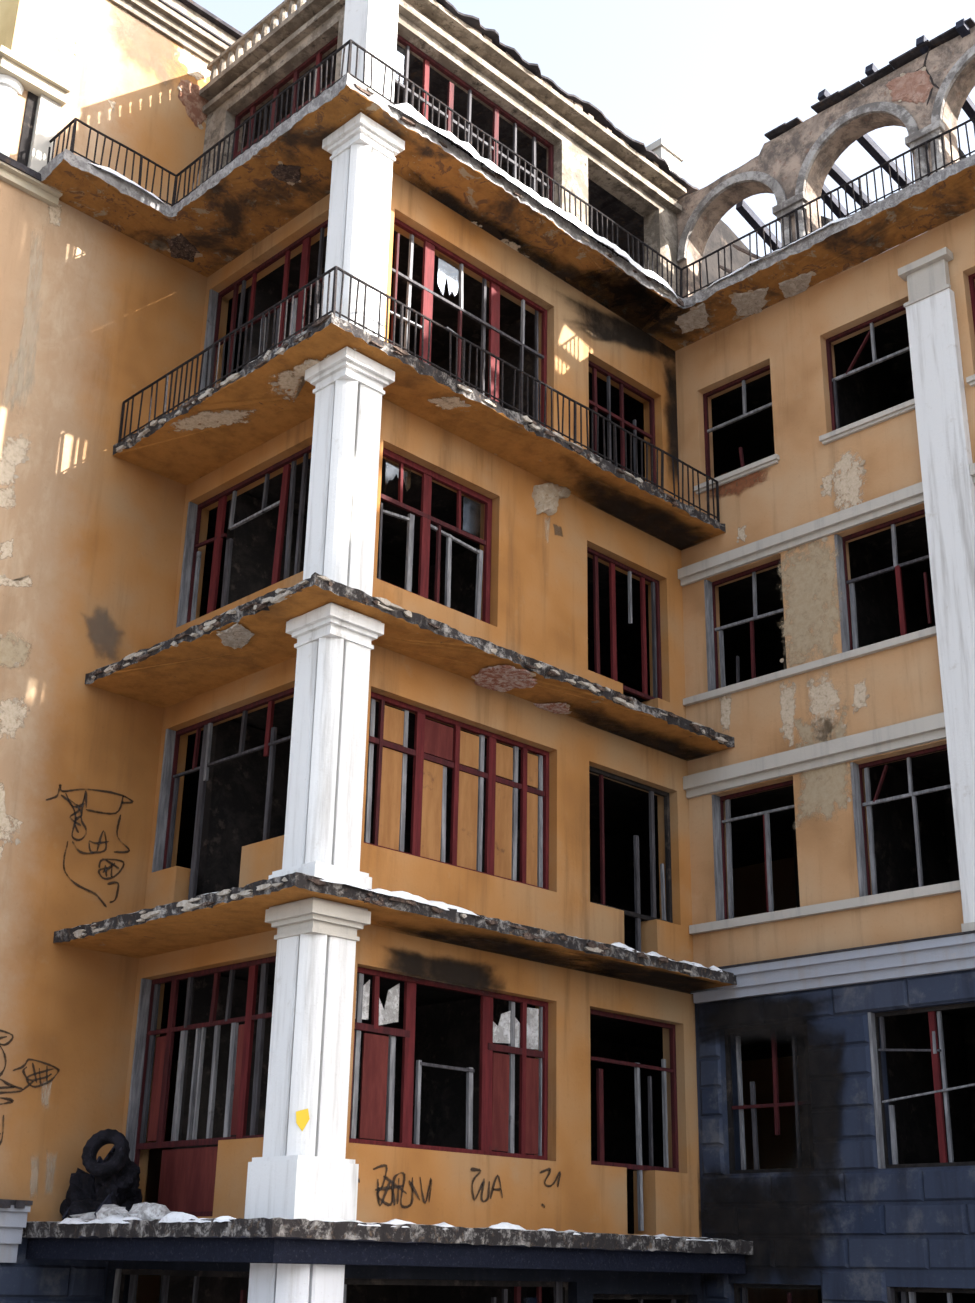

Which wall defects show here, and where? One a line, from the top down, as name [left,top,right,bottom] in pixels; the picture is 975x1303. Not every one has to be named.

spalling [886,67,934,104]
peeling [116,314,331,453]
peeling [0,434,30,510]
spalling [522,416,600,465]
peeling [820,452,866,511]
water stain [88,611,121,658]
spalling [362,597,412,618]
peeling [778,537,870,749]
spalling [471,649,635,714]
peeling [0,697,27,739]
peeling [0,783,23,859]
peeling [796,762,851,827]